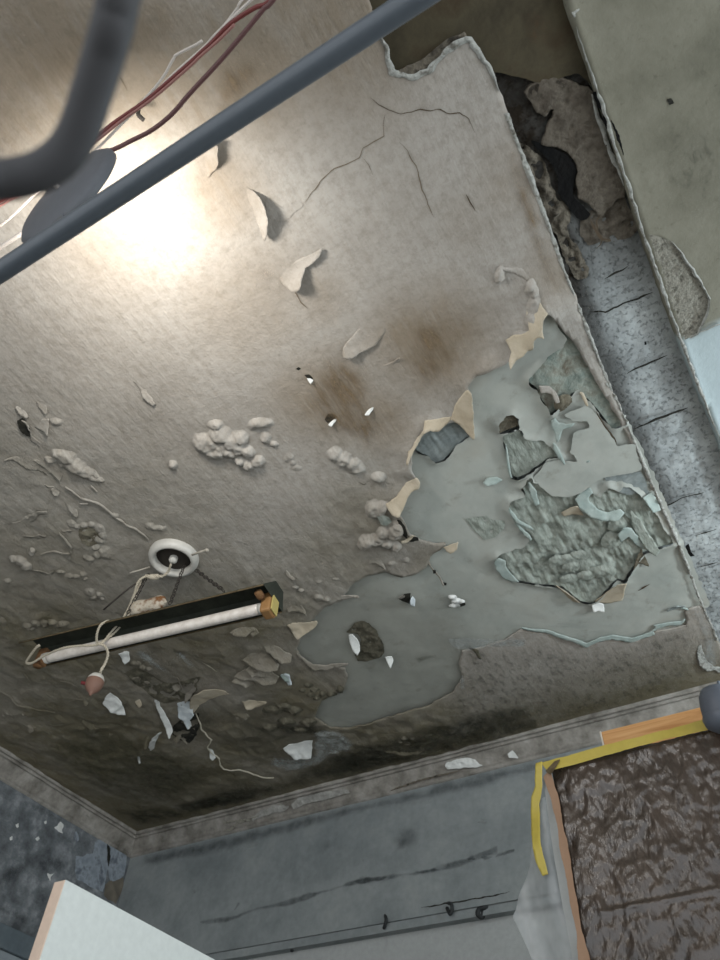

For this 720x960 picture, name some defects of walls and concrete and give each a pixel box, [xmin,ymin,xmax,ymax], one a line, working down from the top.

peeling [204,145,219,178]
crack [306,98,474,215]
peeling [247,187,303,241]
spalling [572,9,720,438]
peeling [280,249,322,292]
crack [592,292,652,313]
crack [627,355,667,374]
peeling [287,113,719,728]
crack [596,408,687,444]
spalling [119,651,228,764]
peeling [283,740,313,760]
water stain [304,702,532,778]